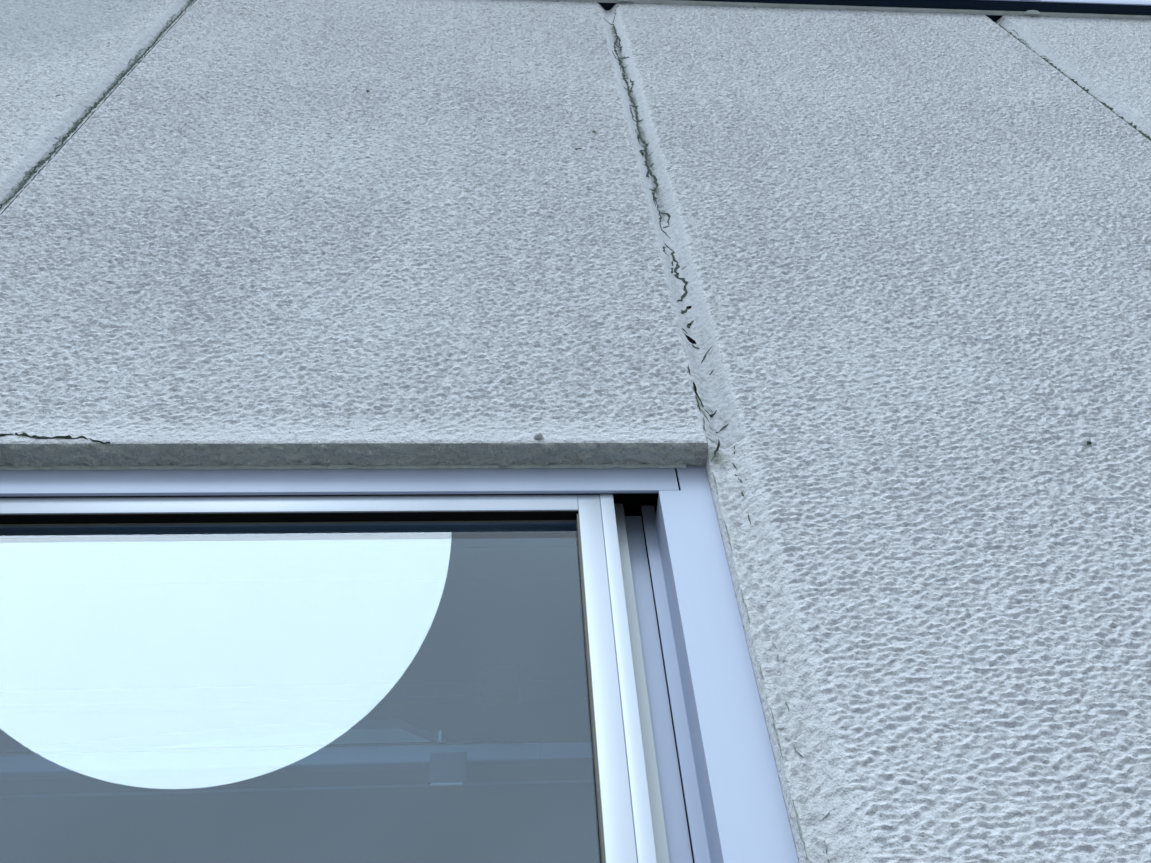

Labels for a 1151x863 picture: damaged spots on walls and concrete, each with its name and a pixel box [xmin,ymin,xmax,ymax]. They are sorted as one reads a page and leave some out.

crack [607,6,751,551]
crack [0,433,111,444]
crack [770,697,803,758]
crack [793,802,830,863]